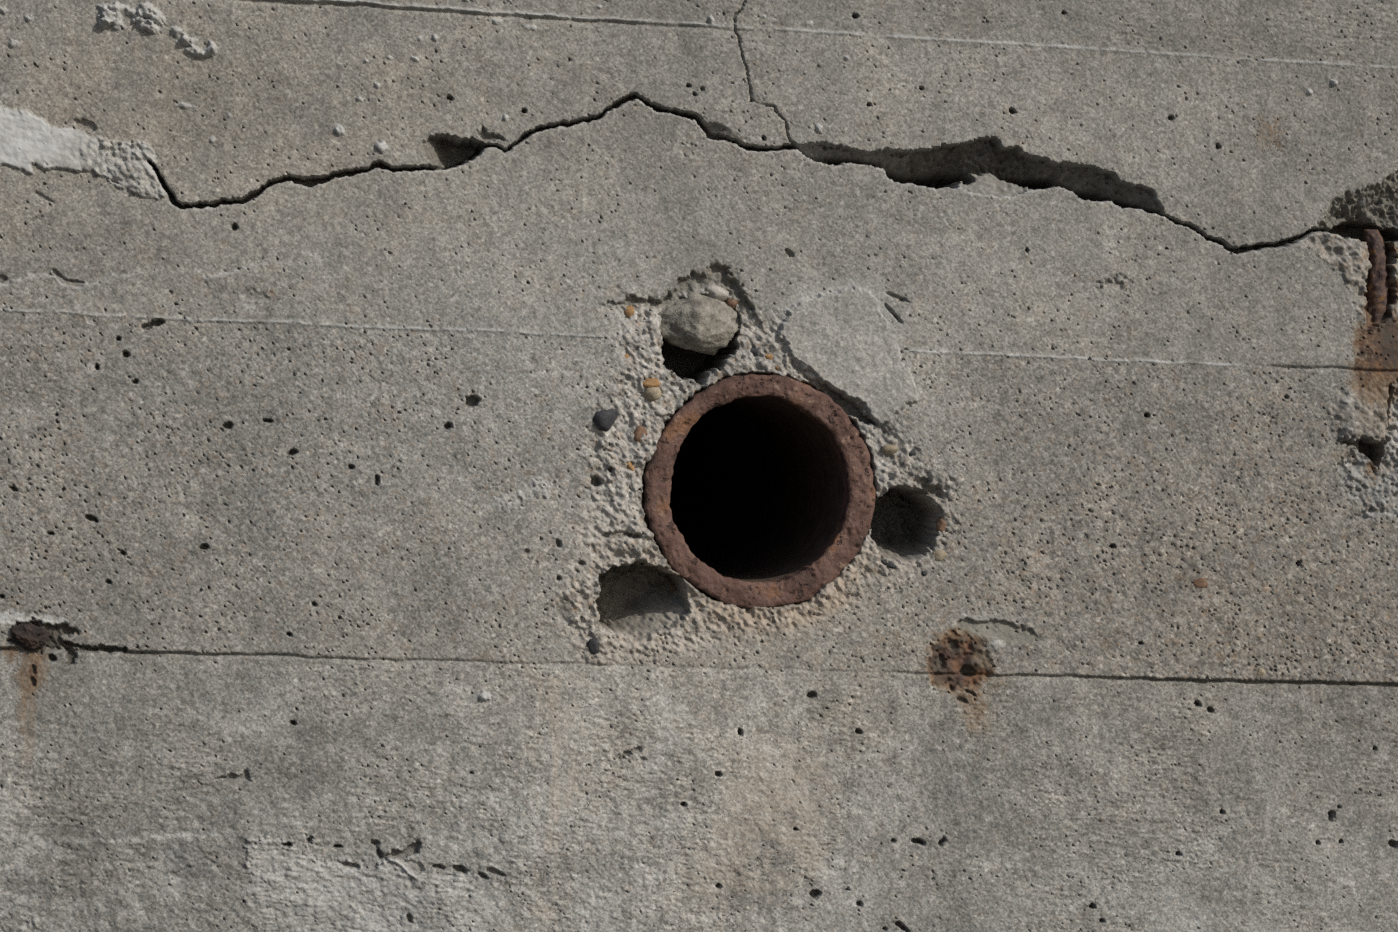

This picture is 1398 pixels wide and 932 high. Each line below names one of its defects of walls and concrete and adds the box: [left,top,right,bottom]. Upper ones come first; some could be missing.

spalling [73,126,167,203]
crack [145,0,1330,258]
spalling [1303,169,1398,331]
rust [1348,312,1398,392]
spalling [544,257,966,673]
spalling [1327,378,1398,524]
rust [0,647,51,771]
rust [923,627,1015,742]